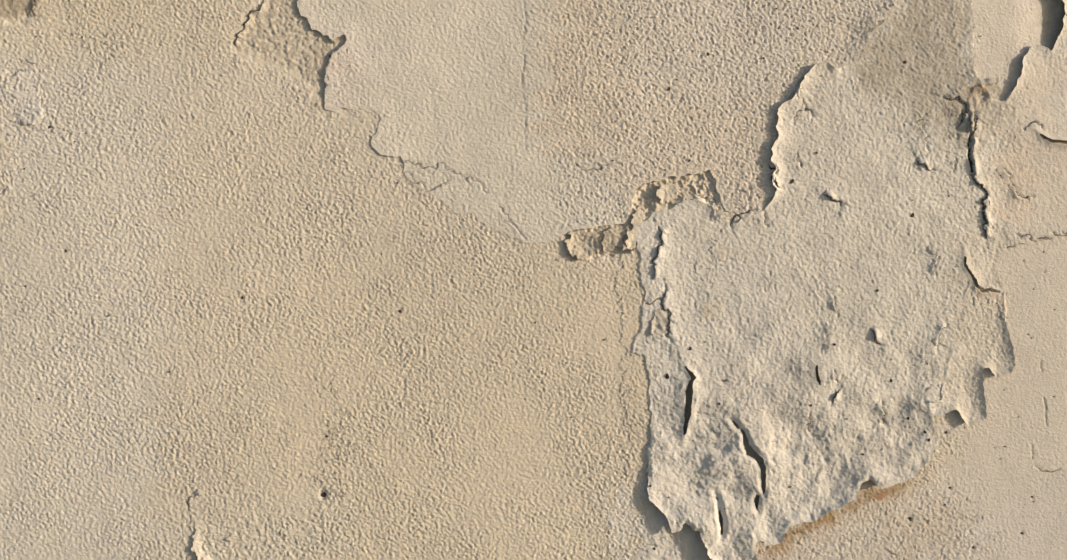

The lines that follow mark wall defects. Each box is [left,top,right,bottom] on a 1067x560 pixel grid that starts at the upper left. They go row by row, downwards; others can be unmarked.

spalling [0,0,32,22]
crack [945,96,1067,248]
peeling [233,0,1067,560]
peeling [187,520,235,560]